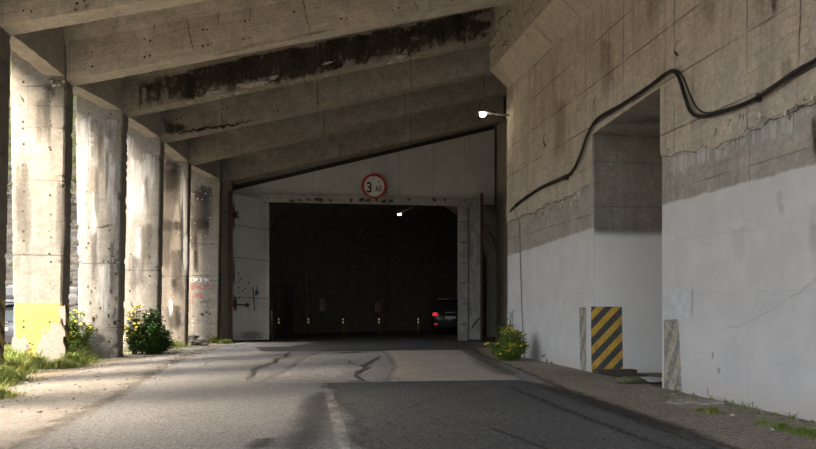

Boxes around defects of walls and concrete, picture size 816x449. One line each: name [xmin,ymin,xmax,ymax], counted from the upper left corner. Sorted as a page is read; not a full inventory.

spalling [165,120,253,135]
peeling [667,90,816,158]
leakage [76,115,212,329]
peeling [12,305,66,361]